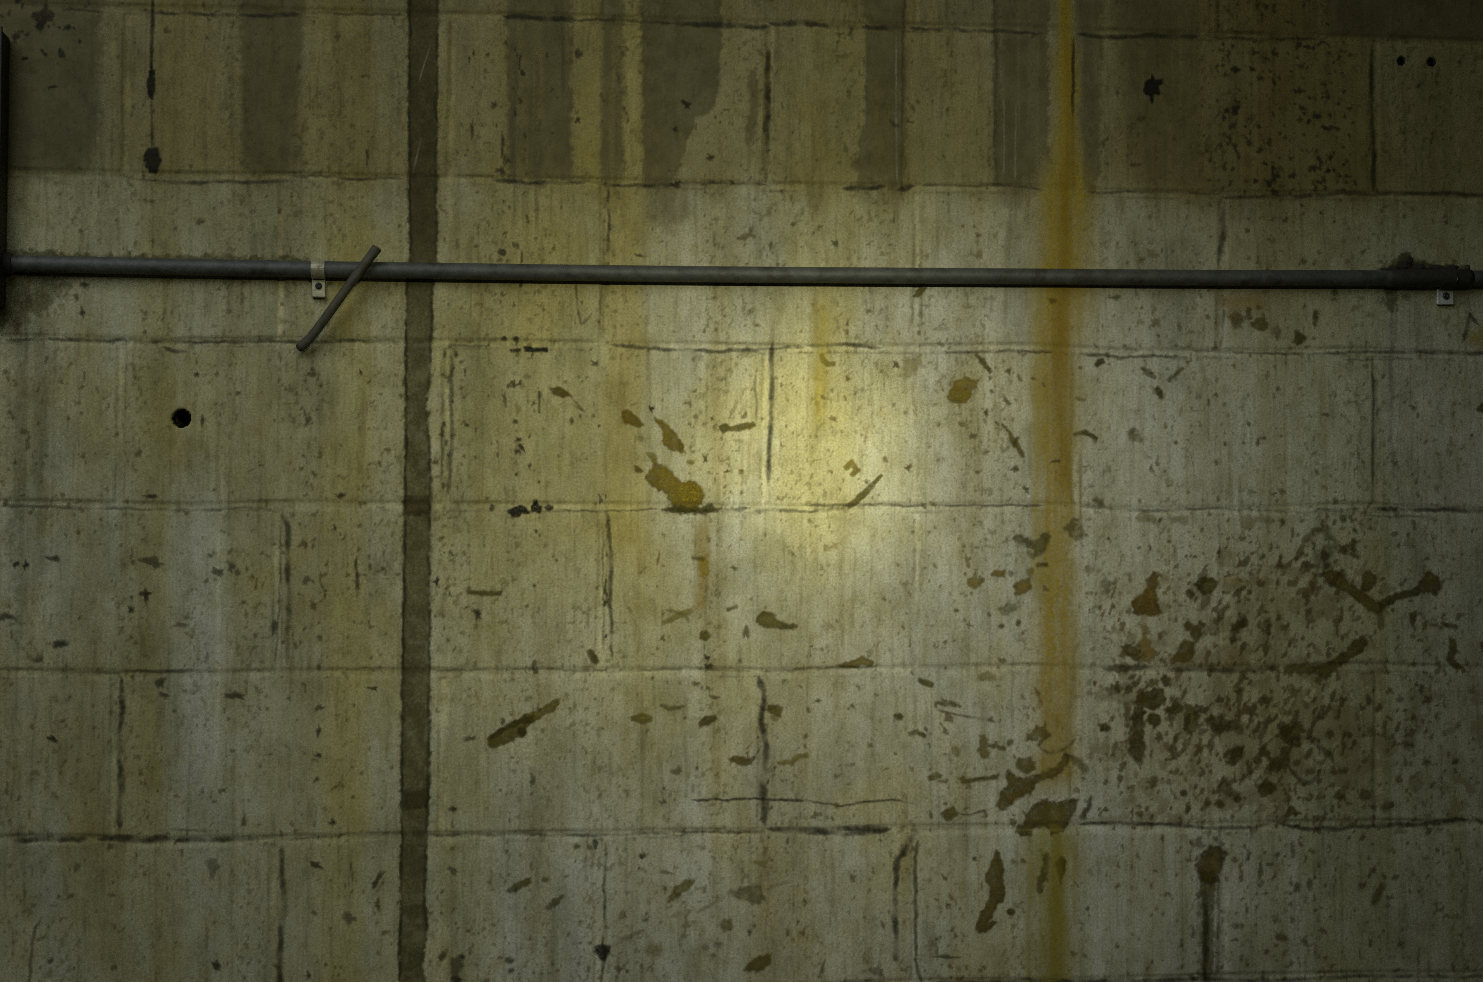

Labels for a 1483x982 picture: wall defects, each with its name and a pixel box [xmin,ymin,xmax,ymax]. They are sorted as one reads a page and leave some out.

water stain [641,0,722,188]
crack [623,345,778,470]
crack [692,680,1107,982]
crack [1289,818,1480,830]
crack [1143,974,1255,982]
water stain [1195,838,1226,982]